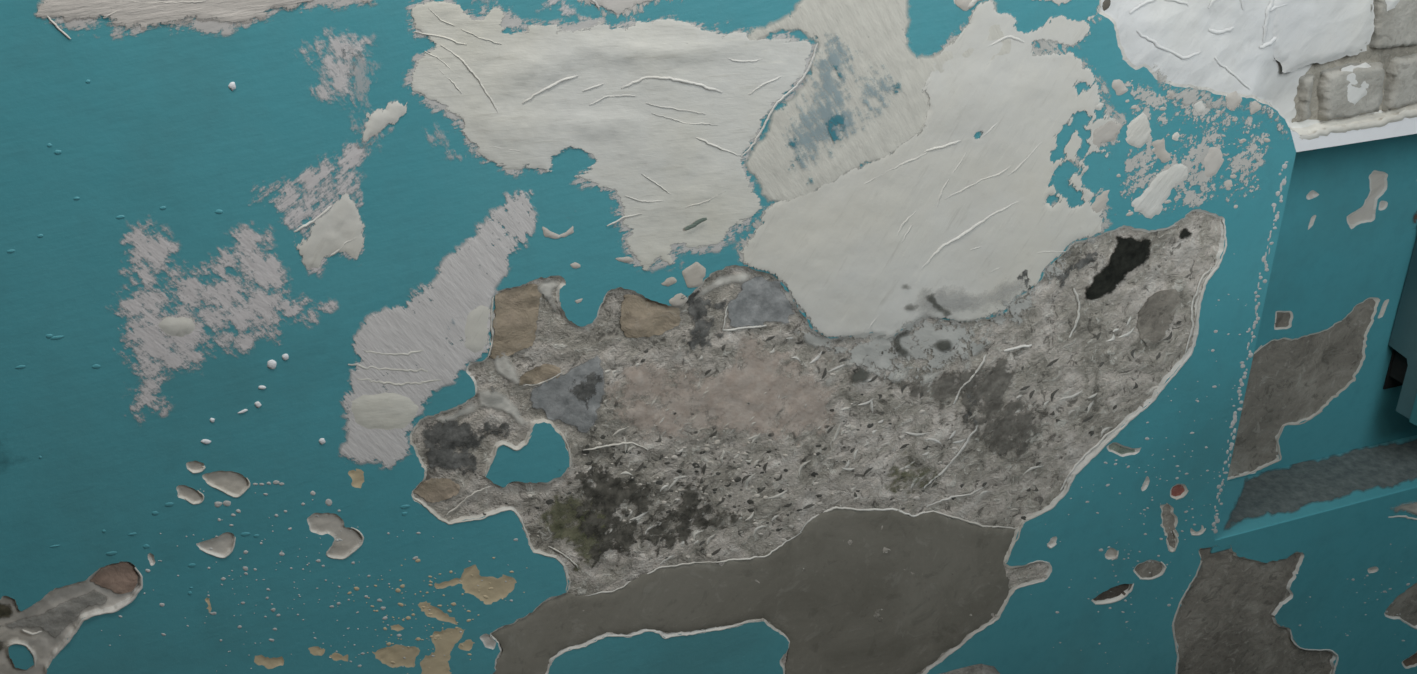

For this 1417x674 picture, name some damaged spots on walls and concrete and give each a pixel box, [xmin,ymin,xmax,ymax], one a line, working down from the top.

flaking render [954,0,981,11]
flaking render [1098,0,1417,140]
peeling [372,209,1227,674]
peeling [1227,297,1389,481]
peeling [0,553,155,674]
peeling [1091,484,1339,674]